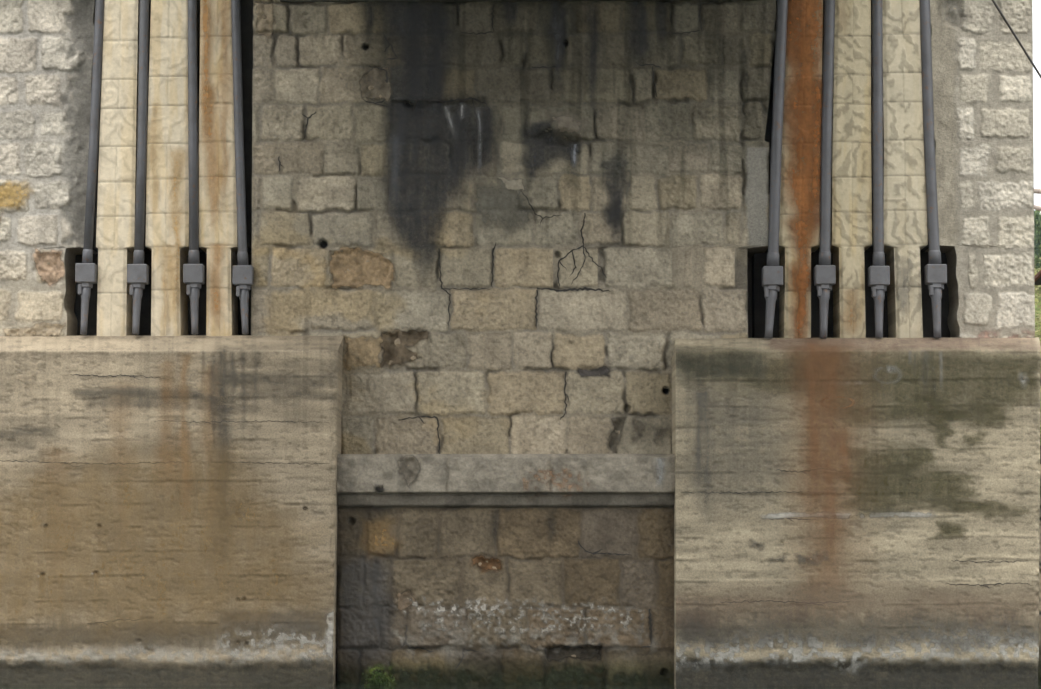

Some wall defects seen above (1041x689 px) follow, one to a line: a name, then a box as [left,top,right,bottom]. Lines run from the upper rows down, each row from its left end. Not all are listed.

damp [386,1,492,259]
damp [524,122,580,179]
rust [786,0,823,338]
crack [520,189,609,328]
spalling [344,329,429,370]